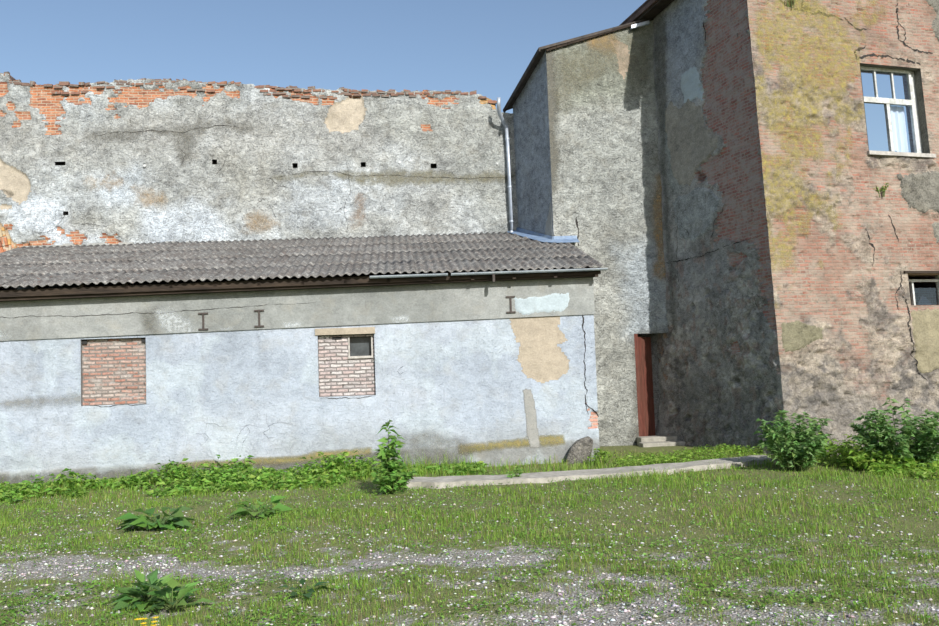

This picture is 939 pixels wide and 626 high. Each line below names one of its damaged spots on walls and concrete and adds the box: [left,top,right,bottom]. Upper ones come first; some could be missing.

crack [780,0,869,31]
crack [896,1,933,54]
spalling [0,82,240,135]
peeling [270,88,367,133]
spalling [420,90,460,109]
peeling [0,159,31,210]
spalling [694,0,823,352]
peeling [897,171,939,243]
peeling [510,316,570,383]
crack [895,275,927,380]